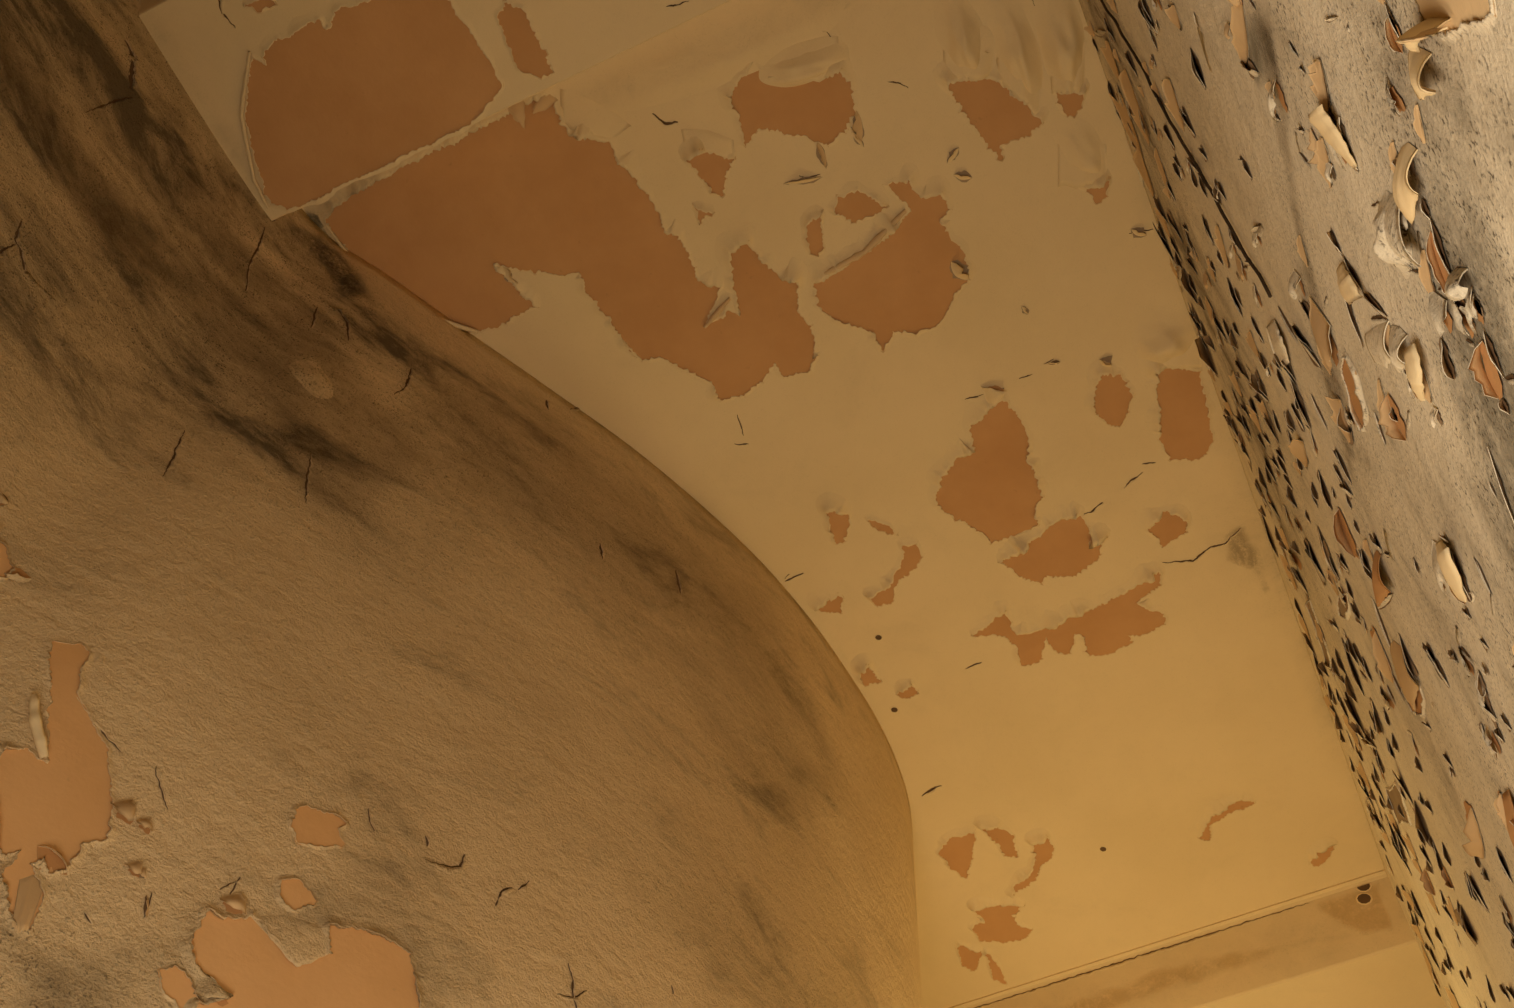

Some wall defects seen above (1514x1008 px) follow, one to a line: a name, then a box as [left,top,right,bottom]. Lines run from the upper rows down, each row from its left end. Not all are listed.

peeling [237,0,977,403]
peeling [806,492,923,614]
peeling [926,0,1514,1008]
peeling [850,652,919,699]
peeling [0,638,153,937]
peeling [286,802,350,850]
peeling [157,874,428,1008]